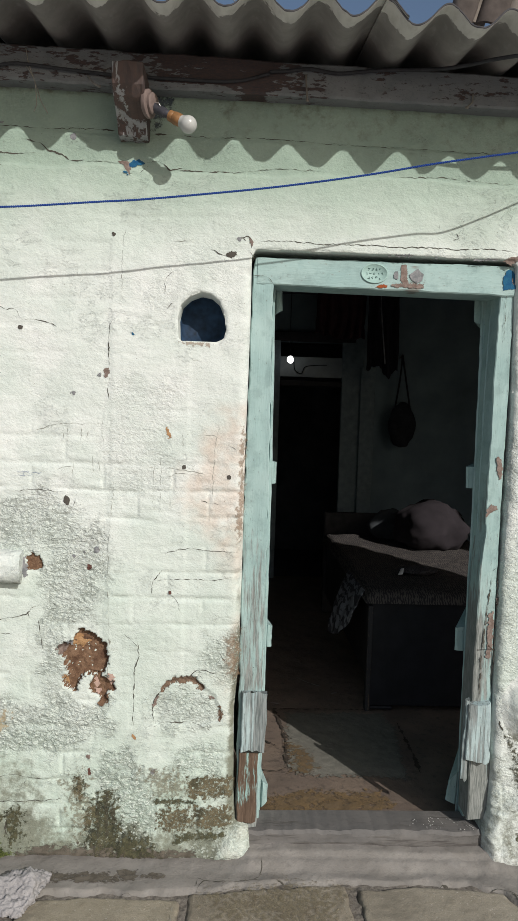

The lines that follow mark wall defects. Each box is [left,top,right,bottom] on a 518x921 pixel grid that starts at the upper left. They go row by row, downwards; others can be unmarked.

crack [0,125,114,165]
flaking render [22,552,44,577]
crack [151,548,235,606]
flaking render [55,627,117,706]
flaking render [152,675,224,722]
damp [14,792,196,859]
damp [51,869,165,883]